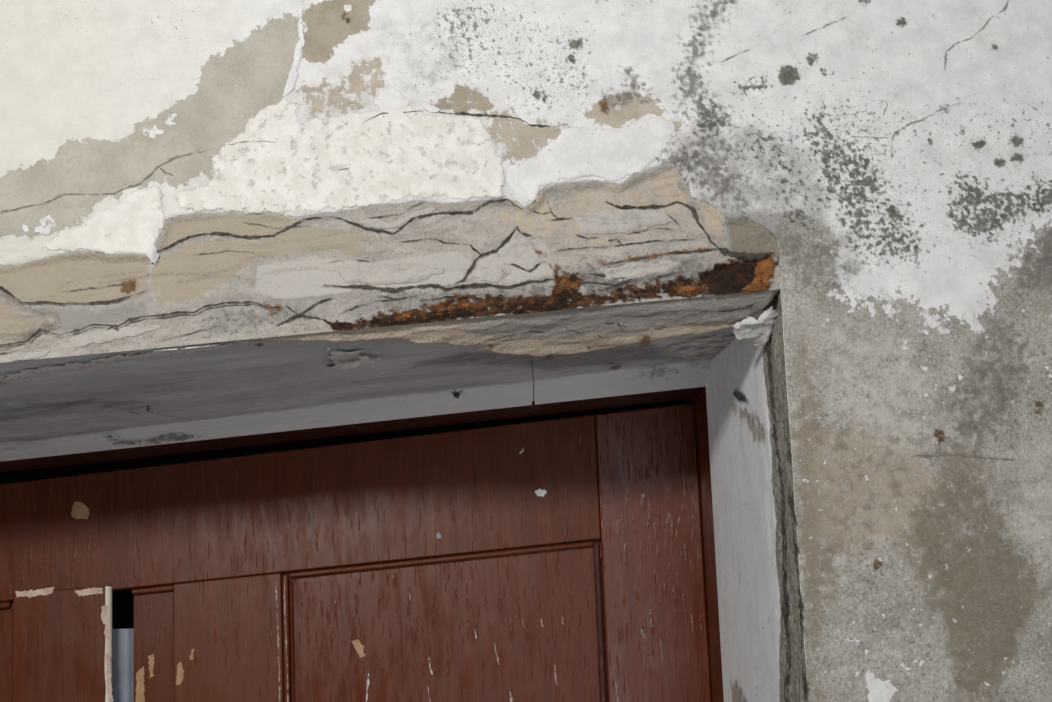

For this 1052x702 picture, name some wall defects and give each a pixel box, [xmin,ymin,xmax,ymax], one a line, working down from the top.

leakage [604,65,659,106]
crack [2,141,274,212]
spalling [0,0,781,363]
leakage [656,0,930,287]
leakage [946,133,1052,242]
crack [0,199,770,354]
corrosion [326,250,779,330]
corrosion [599,247,709,263]
peeling [0,343,237,382]
peeling [327,347,381,370]
peeling [776,213,1052,702]